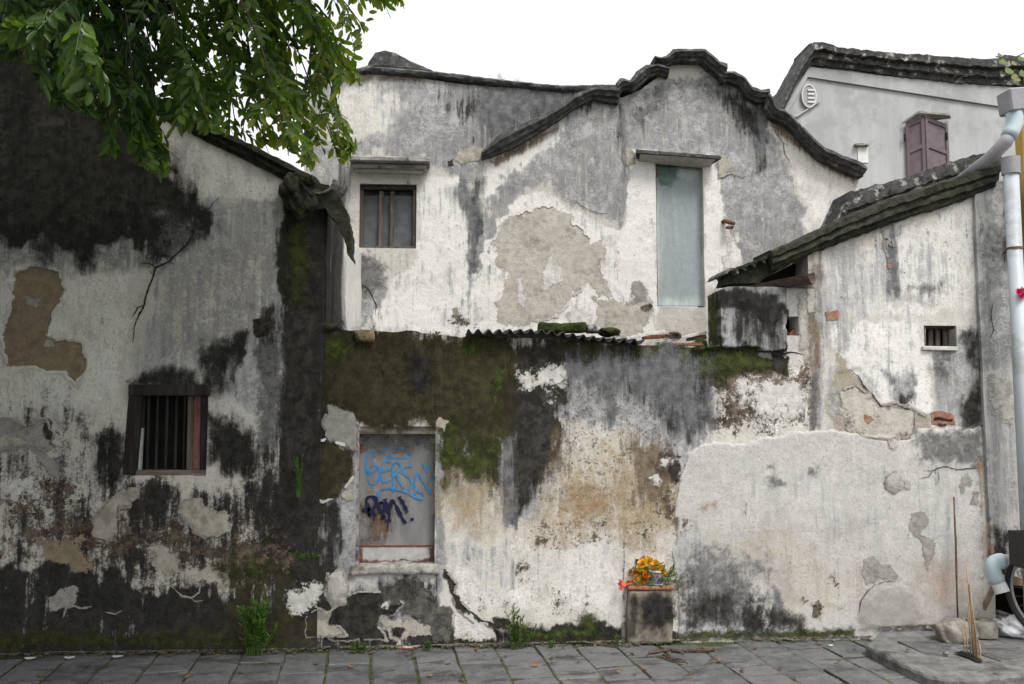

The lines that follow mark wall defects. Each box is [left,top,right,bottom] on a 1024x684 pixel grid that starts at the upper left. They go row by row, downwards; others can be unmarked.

flaking render [0,266,86,386]
damp [0,64,202,273]
crack [132,197,219,343]
damp [454,176,484,273]
flaking render [491,204,654,338]
damp [705,82,768,177]
flaking render [0,416,511,644]
flaking render [321,405,360,451]
damp [490,338,714,524]
flaking render [837,383,956,442]
crack [921,466,977,479]
damp [916,330,984,468]